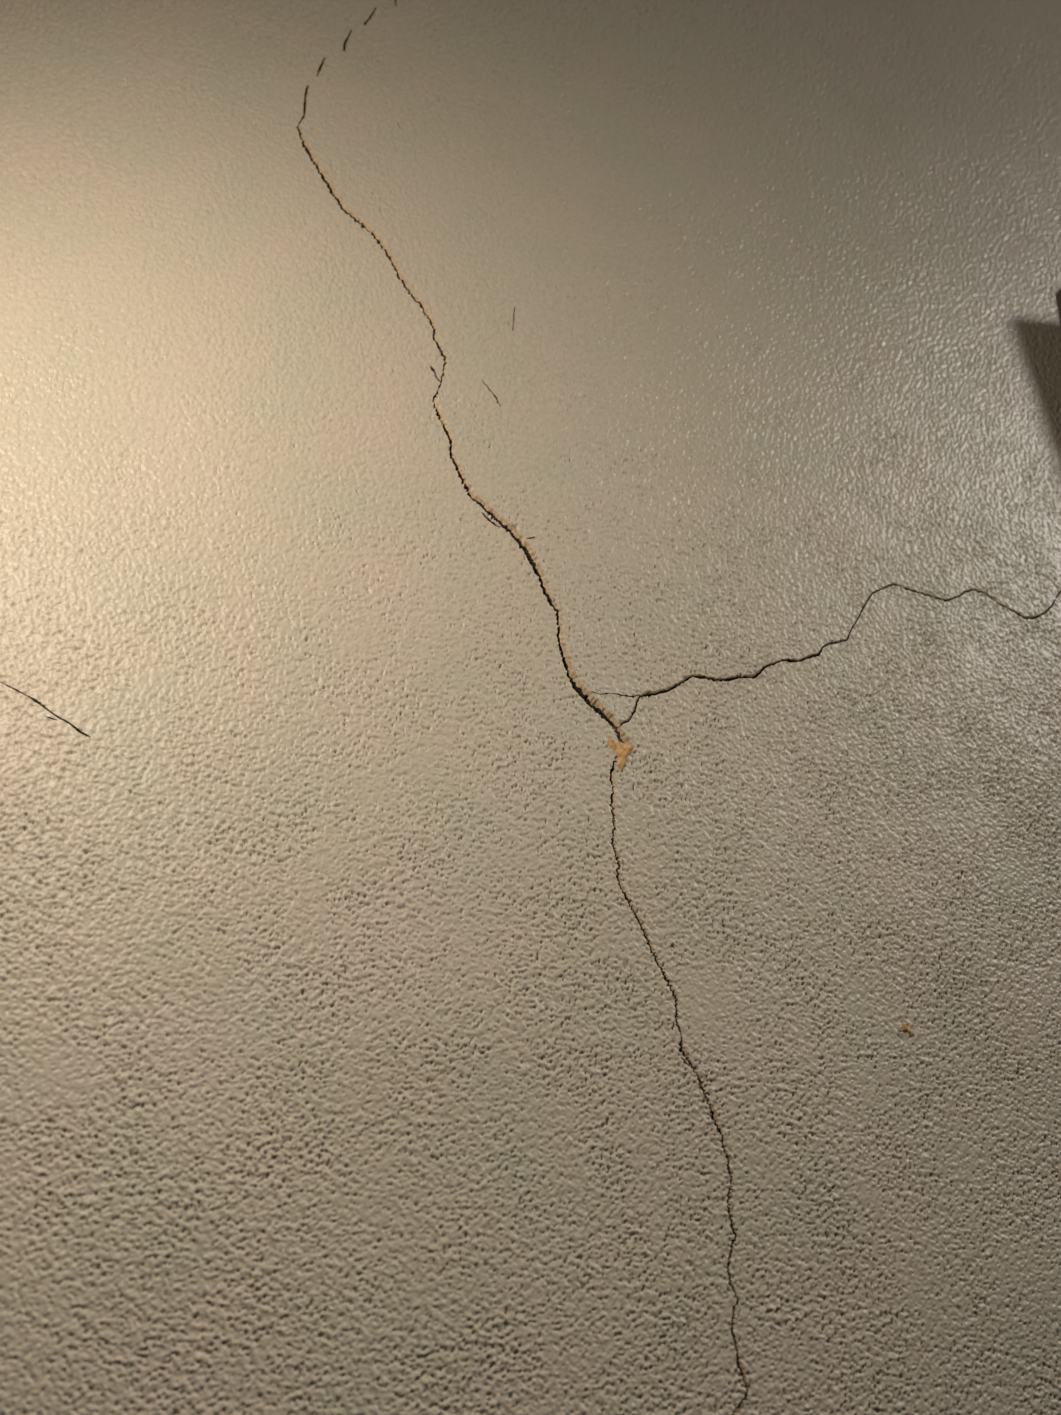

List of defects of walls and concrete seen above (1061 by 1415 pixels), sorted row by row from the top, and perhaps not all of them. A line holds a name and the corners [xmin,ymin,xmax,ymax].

crack [296,0,1061,1415]